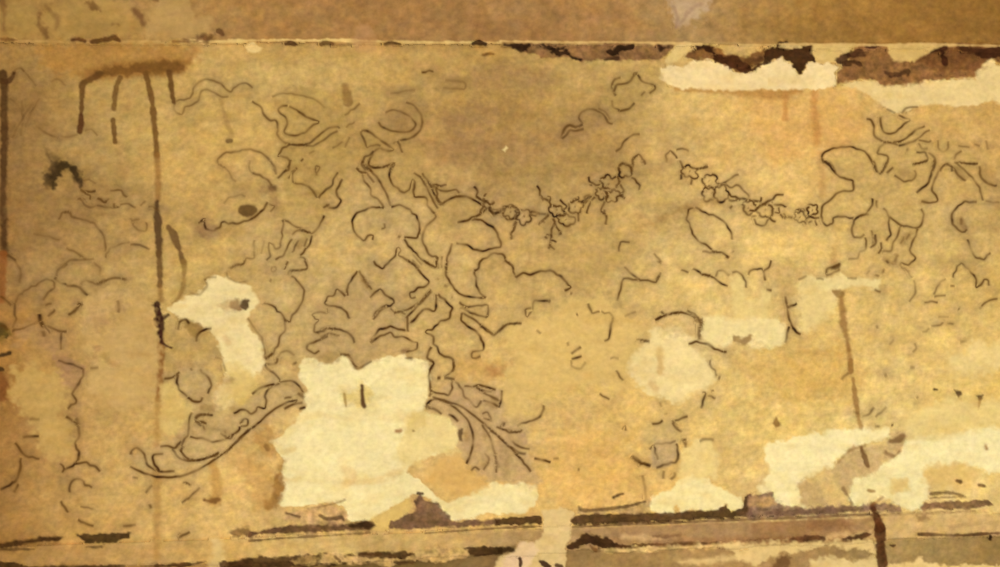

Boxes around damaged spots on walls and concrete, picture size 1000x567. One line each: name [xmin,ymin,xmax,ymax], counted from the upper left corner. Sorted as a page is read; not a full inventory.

peeling [0,0,1000,114]
water stain [0,32,279,382]
water stain [287,160,322,199]
peeling [3,272,266,466]
peeling [0,335,1000,567]
peeling [492,274,787,421]
water stain [713,325,878,430]